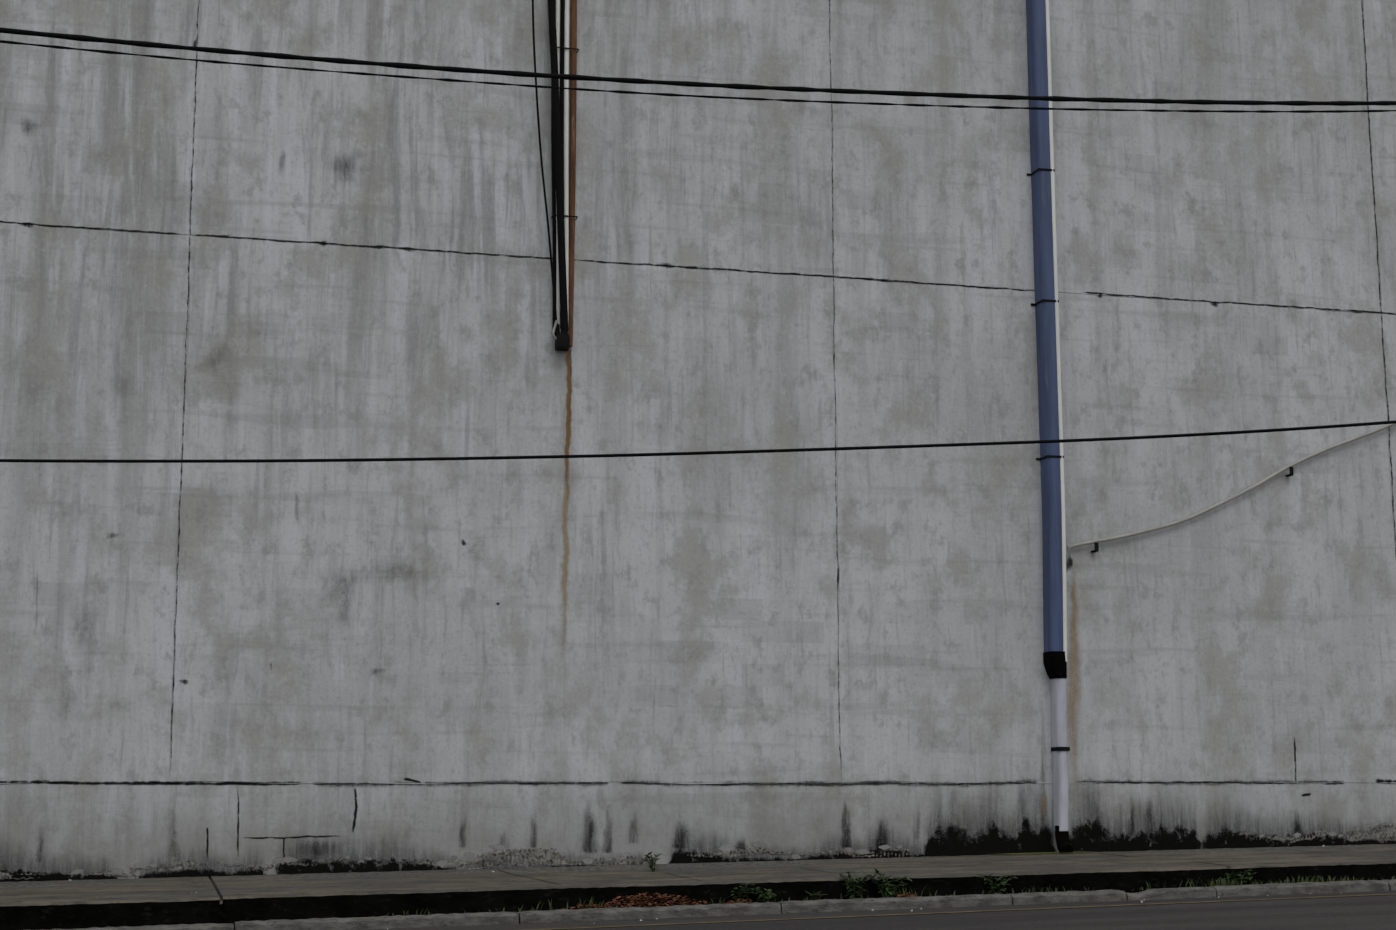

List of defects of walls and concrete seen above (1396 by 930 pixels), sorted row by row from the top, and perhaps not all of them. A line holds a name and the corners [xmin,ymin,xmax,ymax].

corrosion [563,349,572,599]
leakage [483,820,640,869]
leakage [669,801,1396,864]